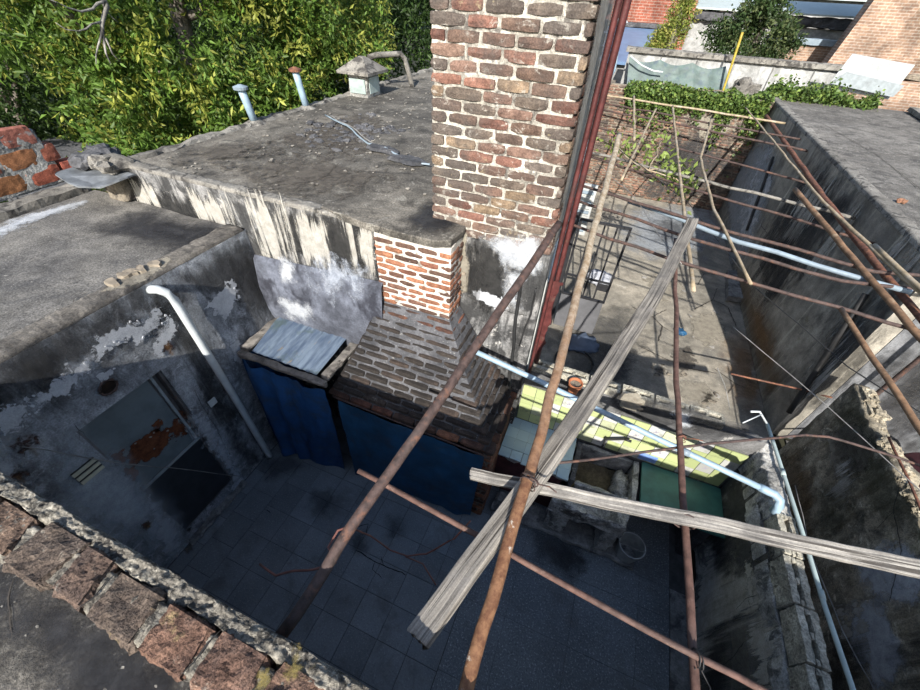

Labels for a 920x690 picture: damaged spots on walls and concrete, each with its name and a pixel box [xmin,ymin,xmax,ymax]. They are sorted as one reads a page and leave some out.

damp [96,177,235,252]
damp [163,112,400,317]
peeling [204,279,240,323]
damp [461,238,540,313]
peeling [0,307,178,439]
rust [108,410,191,483]
damp [825,423,875,504]
damp [875,546,913,557]
damp [836,566,920,686]